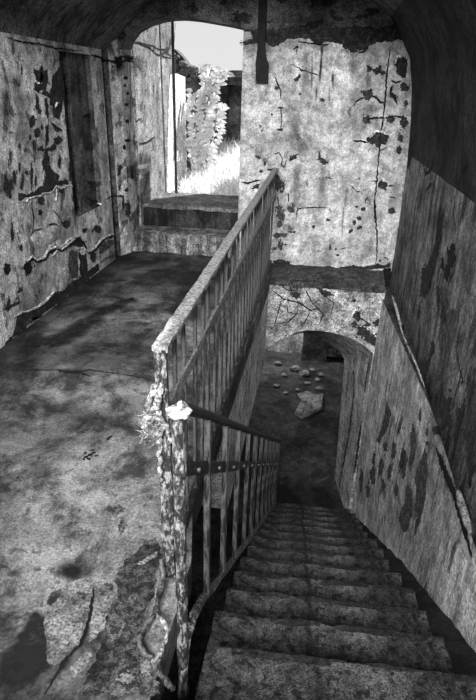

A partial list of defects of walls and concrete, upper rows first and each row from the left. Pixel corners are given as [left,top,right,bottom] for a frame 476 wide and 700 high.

spalling [239,24,402,54]
peeling [6,65,73,205]
crack [373,46,391,264]
peeling [353,54,413,173]
spalling [4,239,115,345]
crack [274,286,334,328]
flaking render [290,279,334,299]
flaking render [351,299,379,346]
flaking render [357,263,464,539]
crack [44,586,95,695]